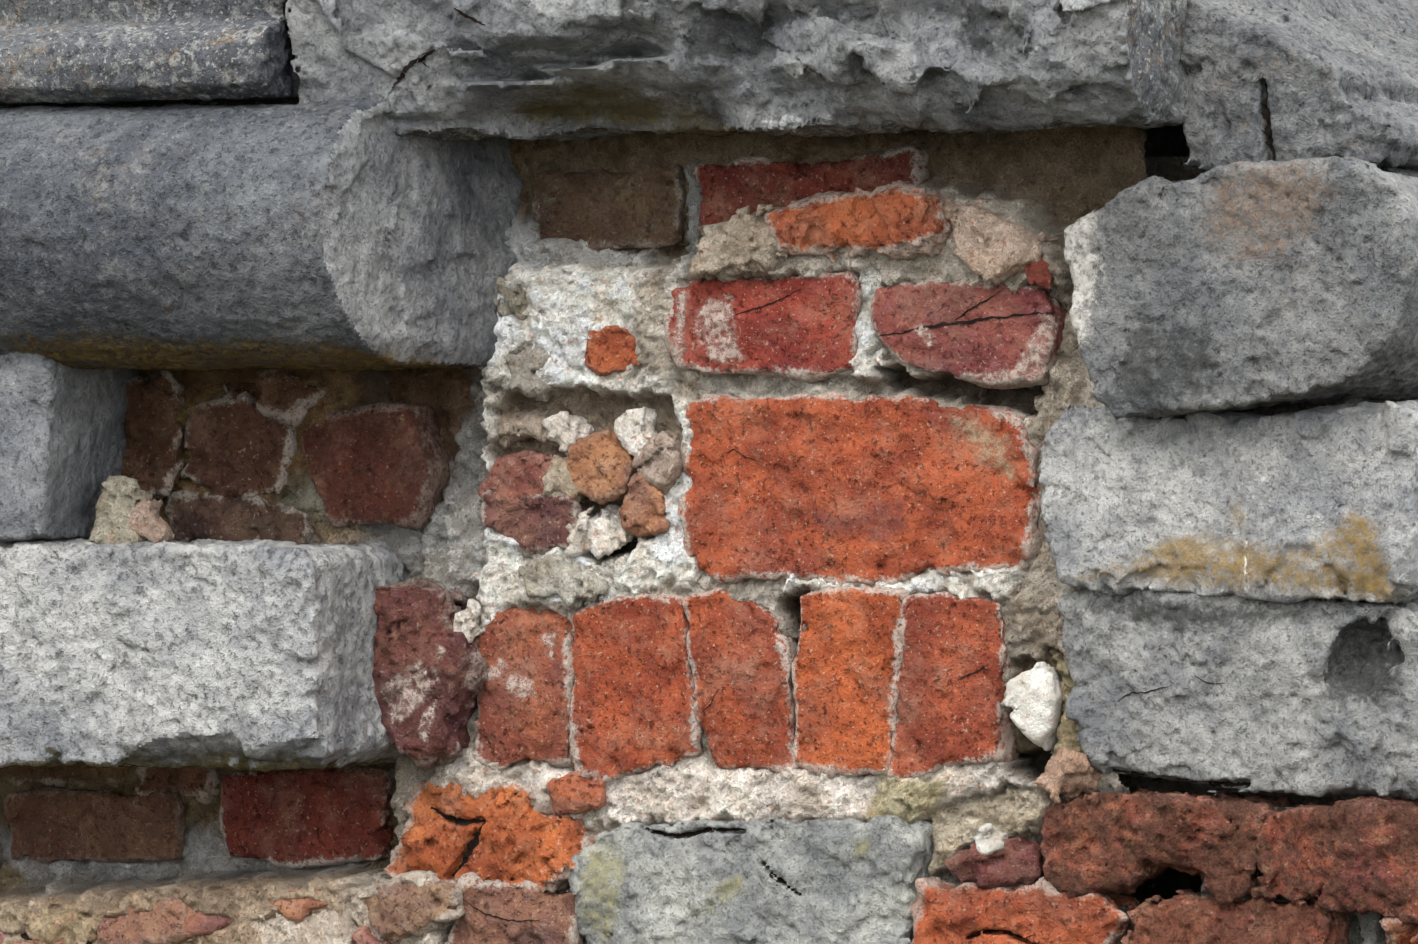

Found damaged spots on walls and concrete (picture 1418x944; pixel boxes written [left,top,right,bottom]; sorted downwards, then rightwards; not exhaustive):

crack [392,49,435,89]
spalling [261,0,1147,366]
crack [880,290,1052,336]
spalling [402,780,562,877]